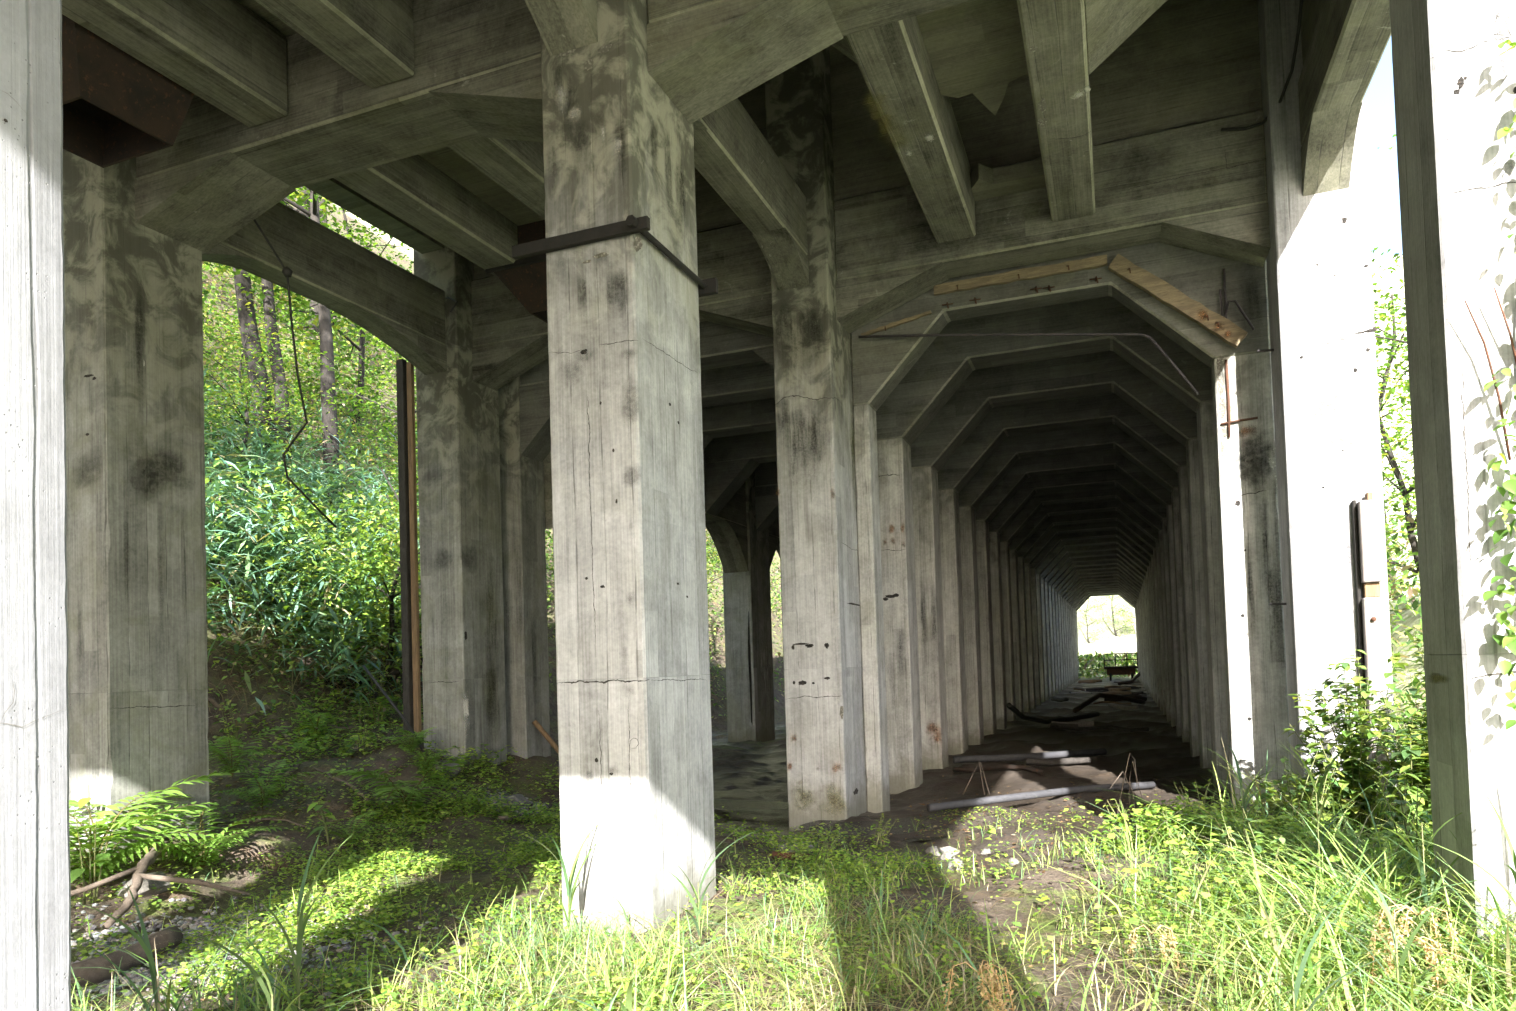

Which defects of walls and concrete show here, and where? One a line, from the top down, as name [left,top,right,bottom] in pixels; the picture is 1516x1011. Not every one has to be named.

crack [1432,12,1513,58]
rust [1220,359,1258,438]
crack [2,684,69,727]